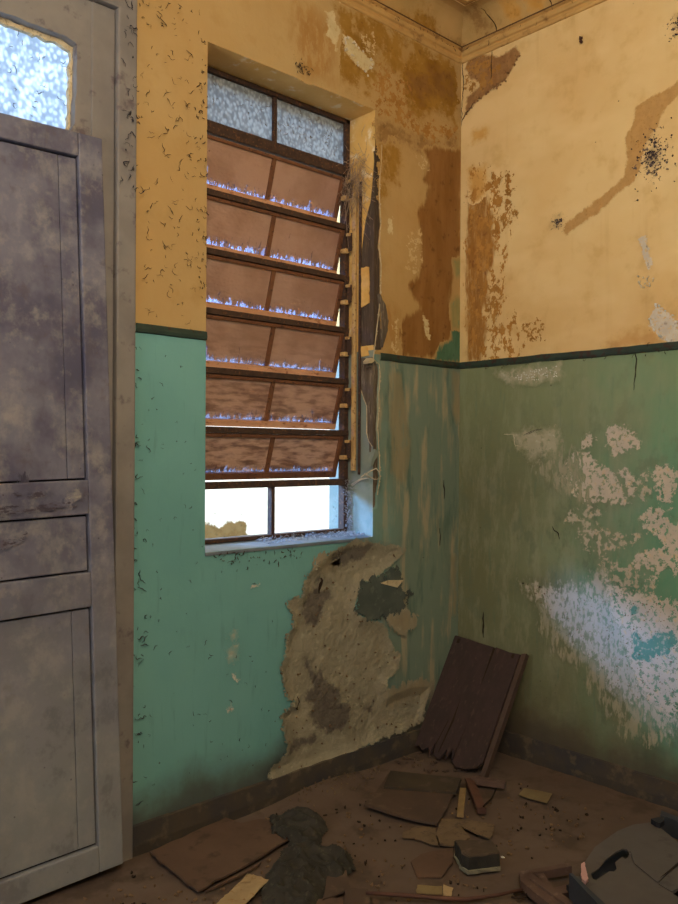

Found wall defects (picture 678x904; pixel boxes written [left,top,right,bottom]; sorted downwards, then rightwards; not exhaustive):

peeling [324,0,377,77]
leakage [288,0,461,157]
peeling [464,45,521,115]
leakage [562,79,678,237]
leakage [449,293,460,332]
peeling [648,302,678,342]
flaking render [267,537,435,780]
peeling [504,422,678,750]